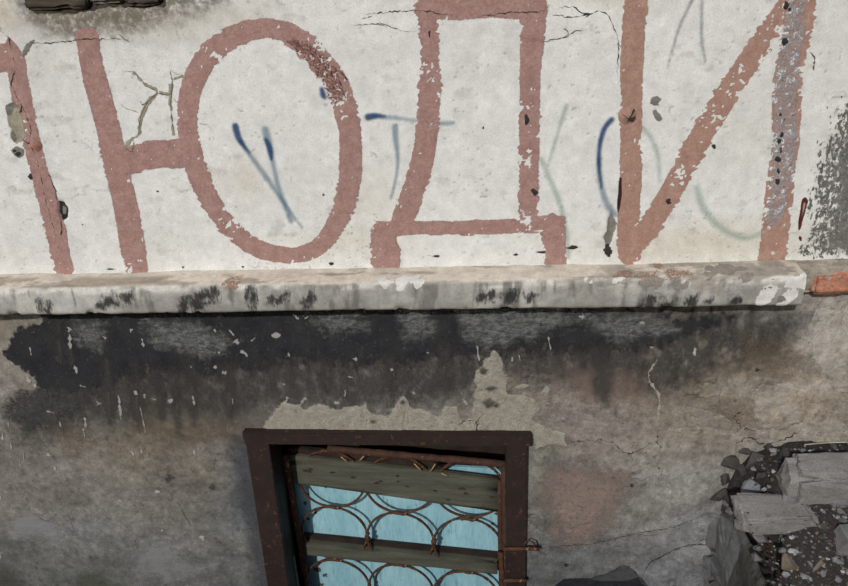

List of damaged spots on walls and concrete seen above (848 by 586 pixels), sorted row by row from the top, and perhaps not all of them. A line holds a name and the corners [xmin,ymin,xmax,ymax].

crack [488,6,621,69]
peeling [5,102,25,158]
crack [0,28,62,261]
crack [120,70,183,152]
peeling [755,96,848,306]
peeling [704,263,754,283]
peeling [808,305,848,388]
peeling [263,350,567,449]
crack [559,358,662,518]
crack [733,410,801,448]
spalling [556,565,647,586]
crack [643,539,705,576]